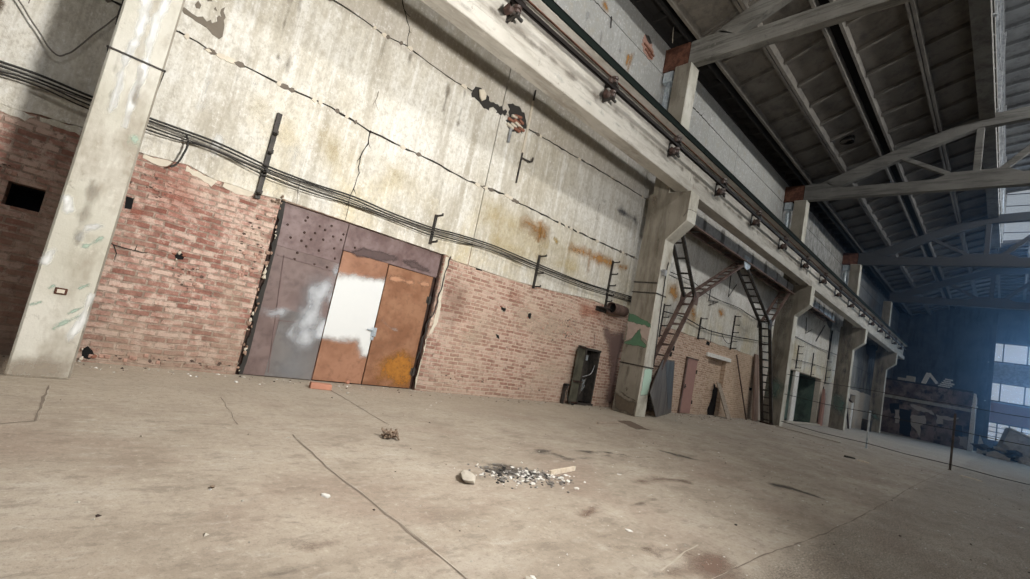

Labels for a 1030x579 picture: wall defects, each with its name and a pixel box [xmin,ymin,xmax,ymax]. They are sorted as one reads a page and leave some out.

flaking render [182,0,245,68]
peeling [0,104,83,135]
spalling [461,84,542,143]
peeling [124,154,173,209]
peeling [185,166,254,197]
crack [345,130,371,220]
corrosion [524,220,558,243]
corrosion [571,247,627,269]